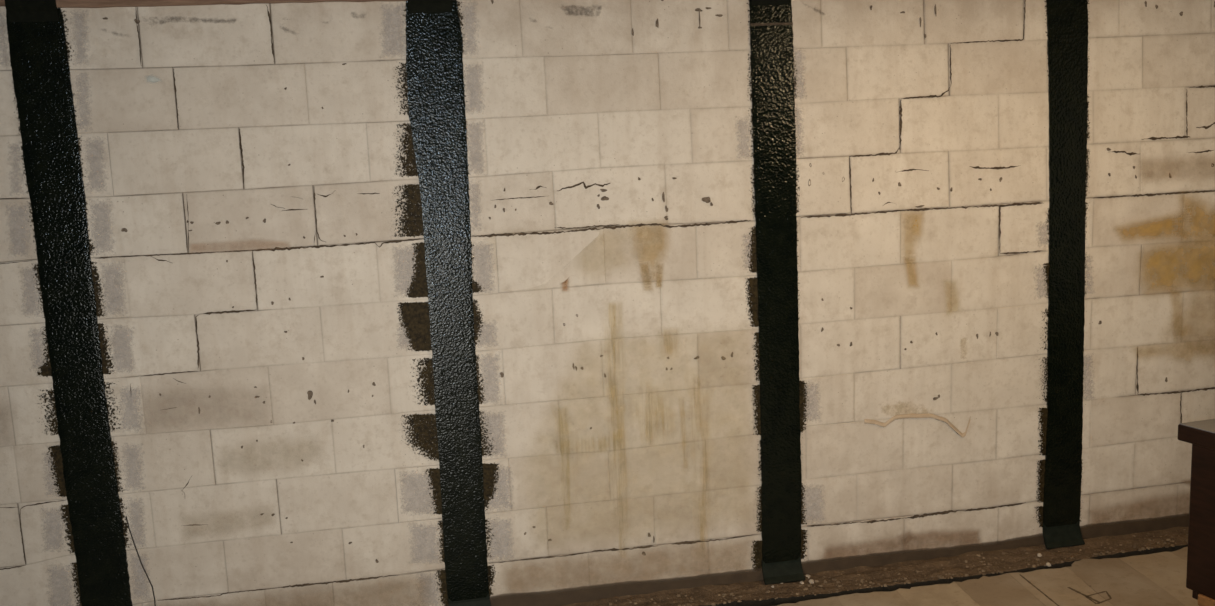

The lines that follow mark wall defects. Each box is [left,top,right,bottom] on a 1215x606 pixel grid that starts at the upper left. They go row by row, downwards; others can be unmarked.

crack [801,0,1043,254]
crack [1112,85,1215,156]
crack [496,182,610,200]
crack [473,220,750,237]